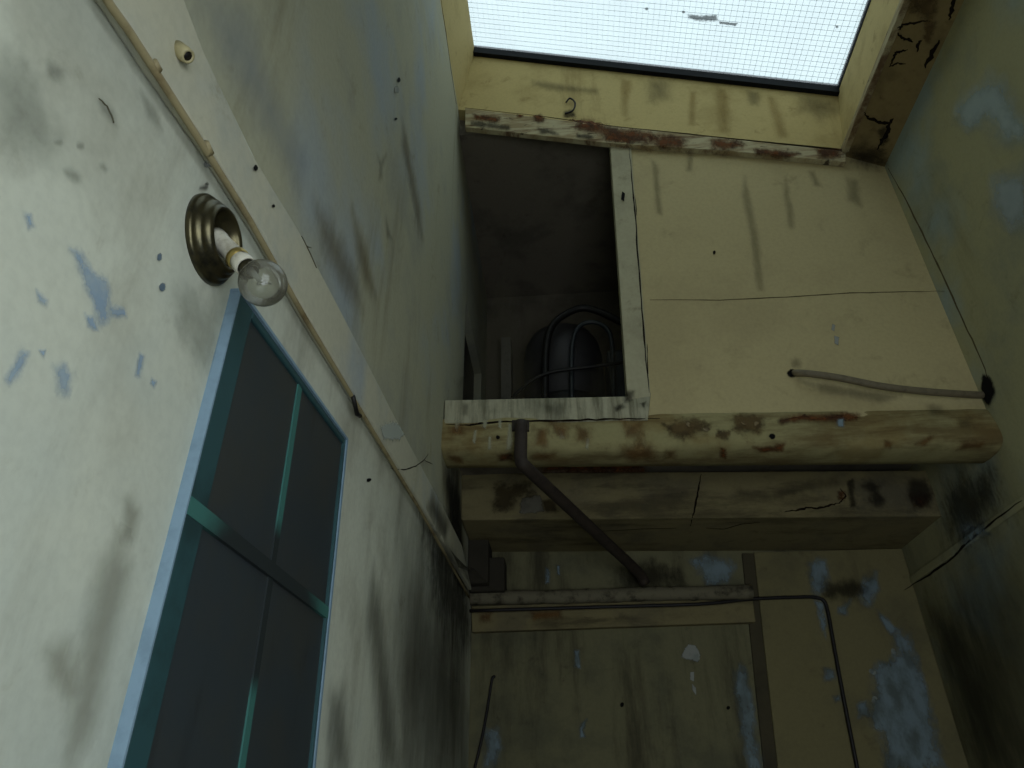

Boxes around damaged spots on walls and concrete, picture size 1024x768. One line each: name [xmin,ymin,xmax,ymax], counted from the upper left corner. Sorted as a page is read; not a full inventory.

crack [889,0,956,68]
corrosion [572,119,686,150]
corrosion [712,139,801,159]
crack [718,112,987,376]
peeling [77,254,125,328]
corrosion [535,426,649,473]
crack [609,475,759,531]
crack [785,489,847,512]
crack [904,500,1022,590]
damp [407,526,468,752]
peeling [858,614,944,768]